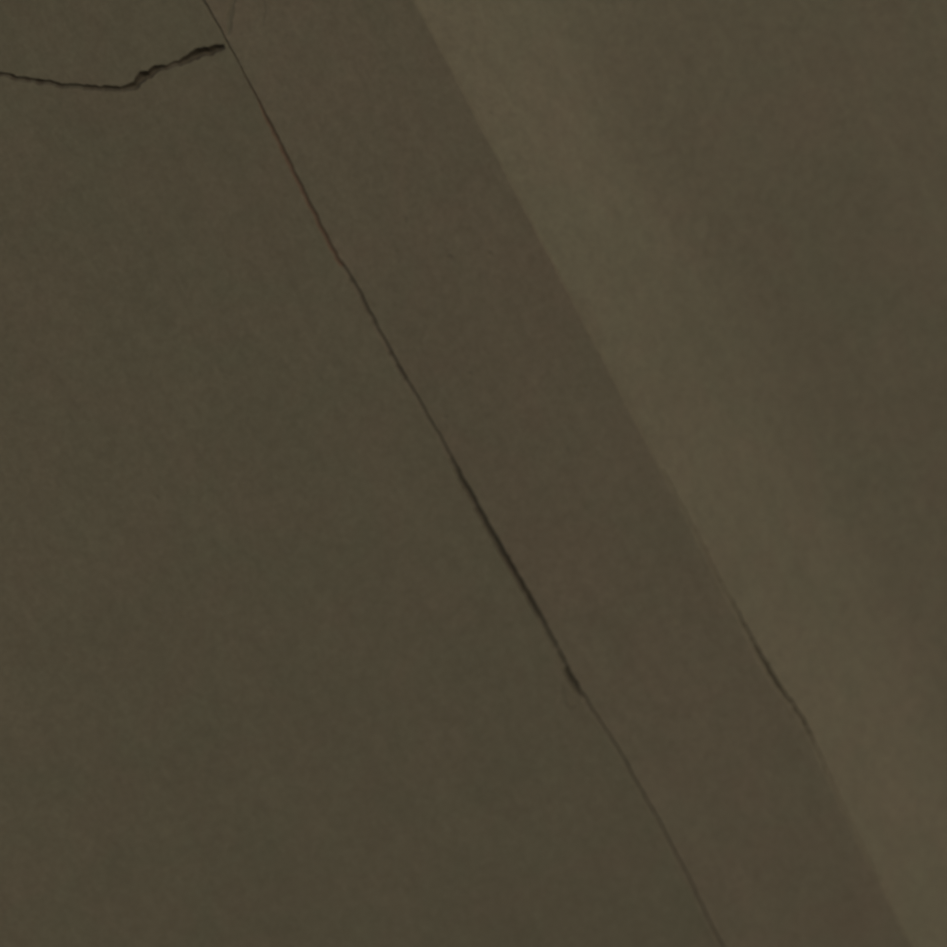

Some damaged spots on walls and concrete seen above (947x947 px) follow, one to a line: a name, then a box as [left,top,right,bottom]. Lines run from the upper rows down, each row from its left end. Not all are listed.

crack [0,0,724,947]